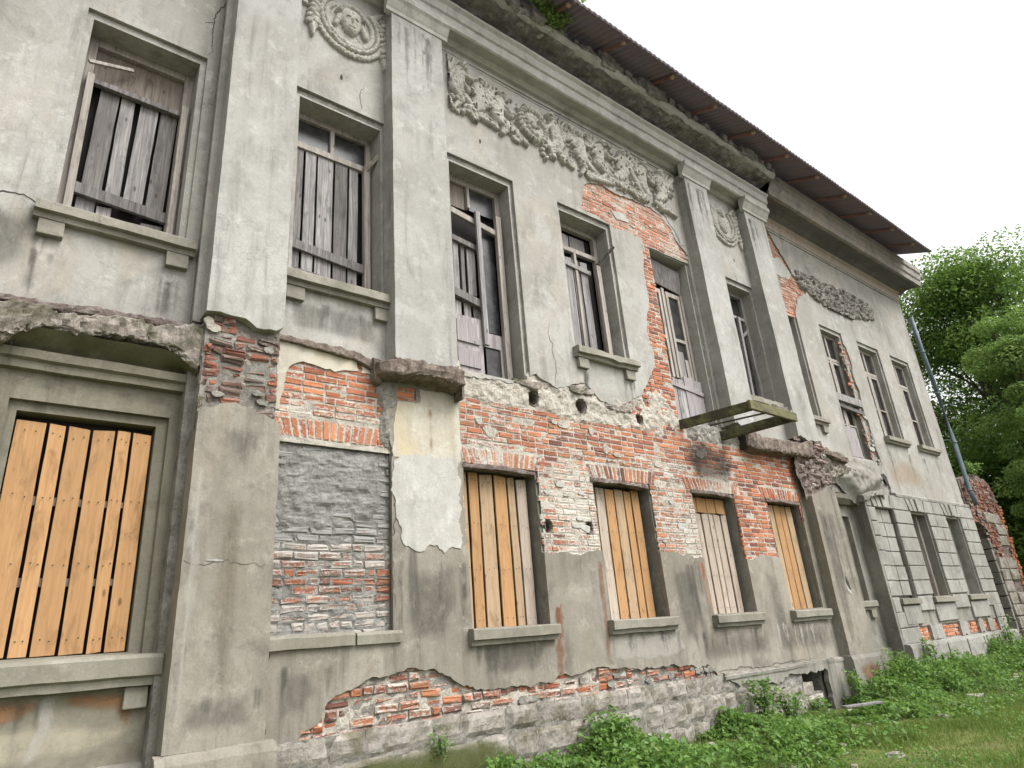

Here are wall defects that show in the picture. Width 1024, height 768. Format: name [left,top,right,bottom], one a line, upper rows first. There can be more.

crack [207,5,225,56]
flaking render [194,315,391,454]
flaking render [457,183,856,560]
crack [184,558,269,566]
flaking render [298,665,716,741]